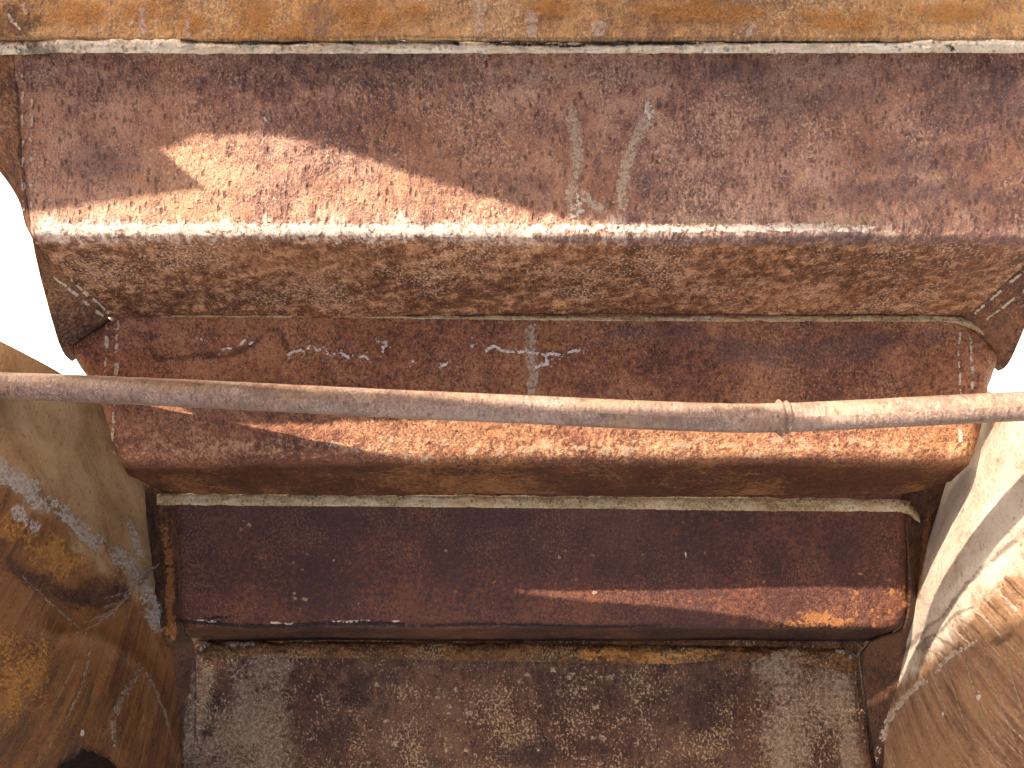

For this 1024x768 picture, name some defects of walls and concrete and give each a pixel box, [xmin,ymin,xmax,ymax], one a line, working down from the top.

rust [580,647,719,664]